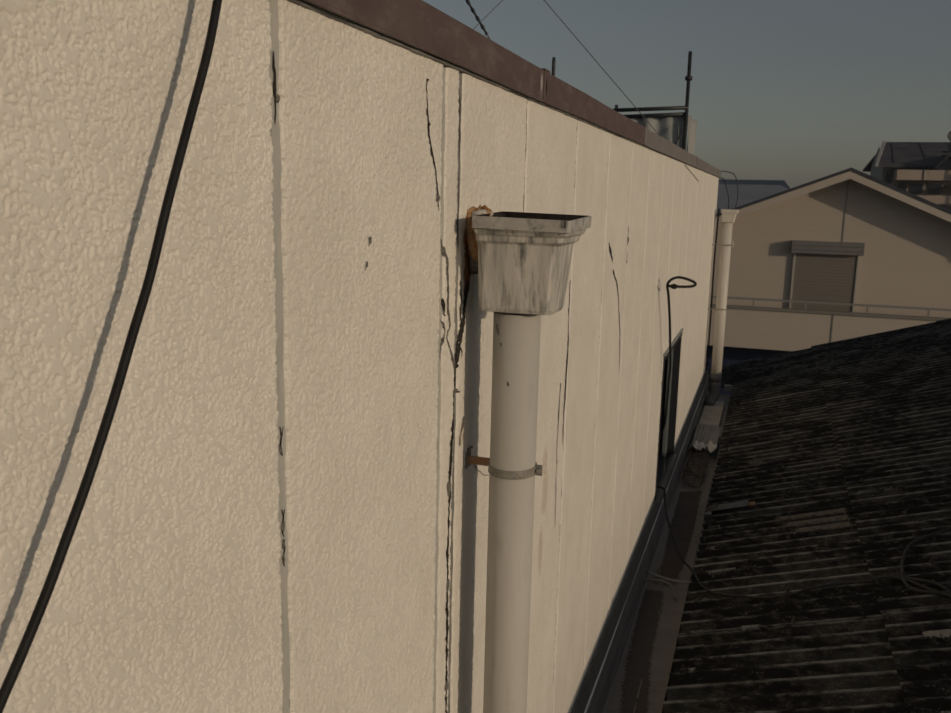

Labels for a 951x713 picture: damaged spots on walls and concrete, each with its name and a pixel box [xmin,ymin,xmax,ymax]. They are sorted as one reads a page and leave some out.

crack [426,79,471,713]
crack [609,242,620,328]